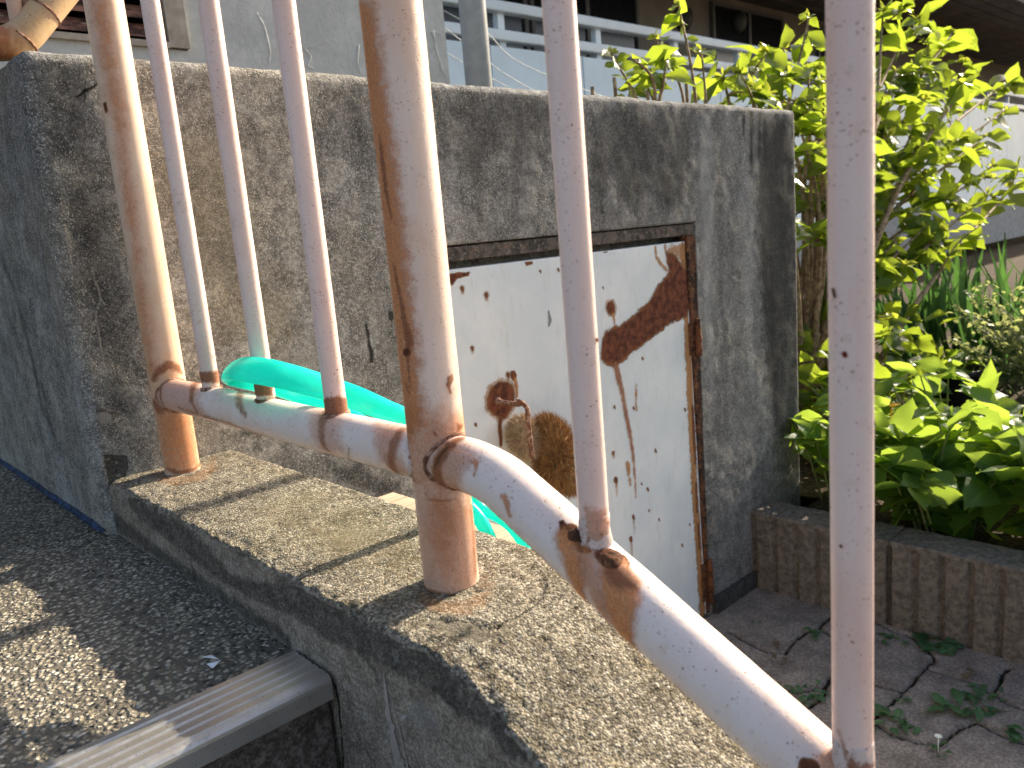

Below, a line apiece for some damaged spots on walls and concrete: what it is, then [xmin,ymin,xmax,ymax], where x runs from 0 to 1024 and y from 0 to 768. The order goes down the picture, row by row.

corrosion [359,0,422,480]
corrosion [450,272,470,292]
corrosion [151,361,220,474]
corrosion [432,423,477,513]
corrosion [485,371,518,447]
corrosion [595,242,705,618]